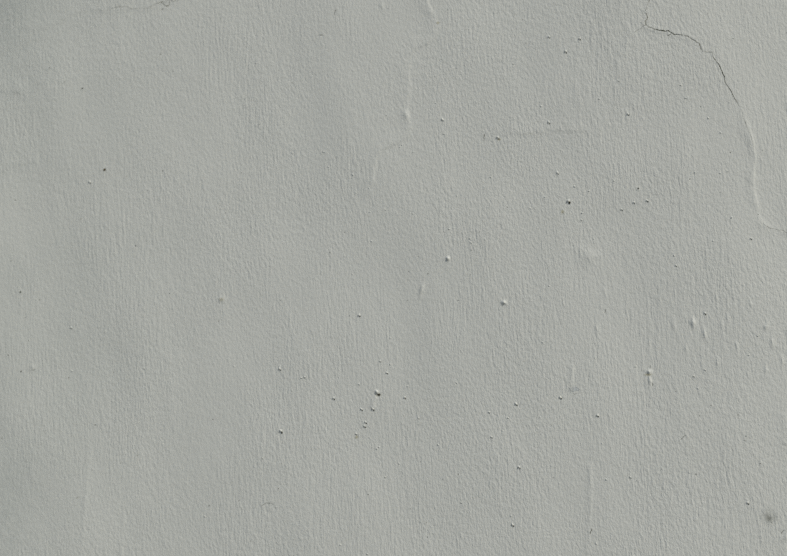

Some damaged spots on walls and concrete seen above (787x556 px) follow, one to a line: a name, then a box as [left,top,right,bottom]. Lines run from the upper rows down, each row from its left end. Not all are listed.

crack [641,0,753,141]